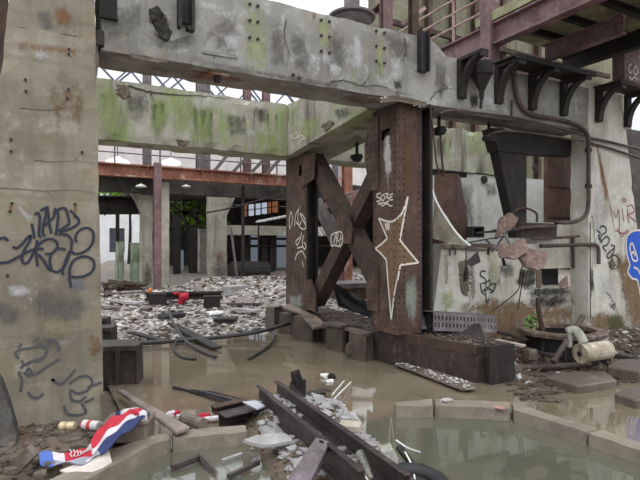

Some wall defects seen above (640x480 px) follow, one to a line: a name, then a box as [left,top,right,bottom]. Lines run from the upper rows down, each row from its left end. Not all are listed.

spalling [114,82,132,99]
crack [330,73,414,95]
leakage [609,317,624,330]